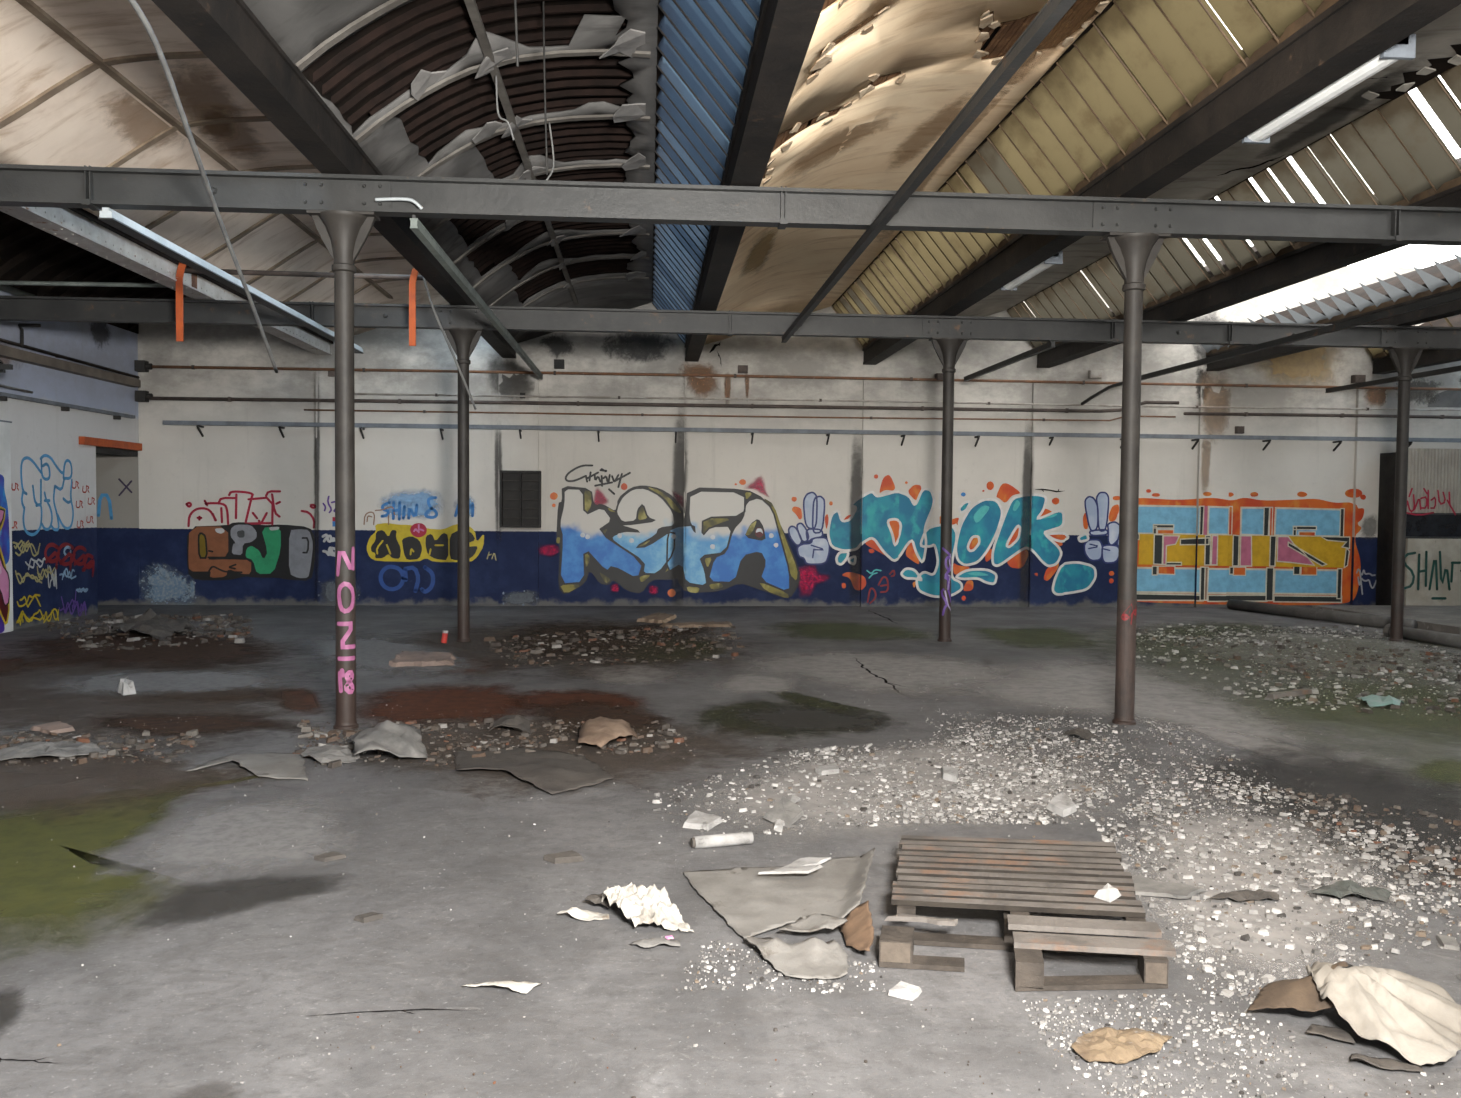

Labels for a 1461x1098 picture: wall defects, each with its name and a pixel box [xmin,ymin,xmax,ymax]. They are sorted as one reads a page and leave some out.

flaking render [972,10,1039,65]
flaking render [1034,0,1109,58]